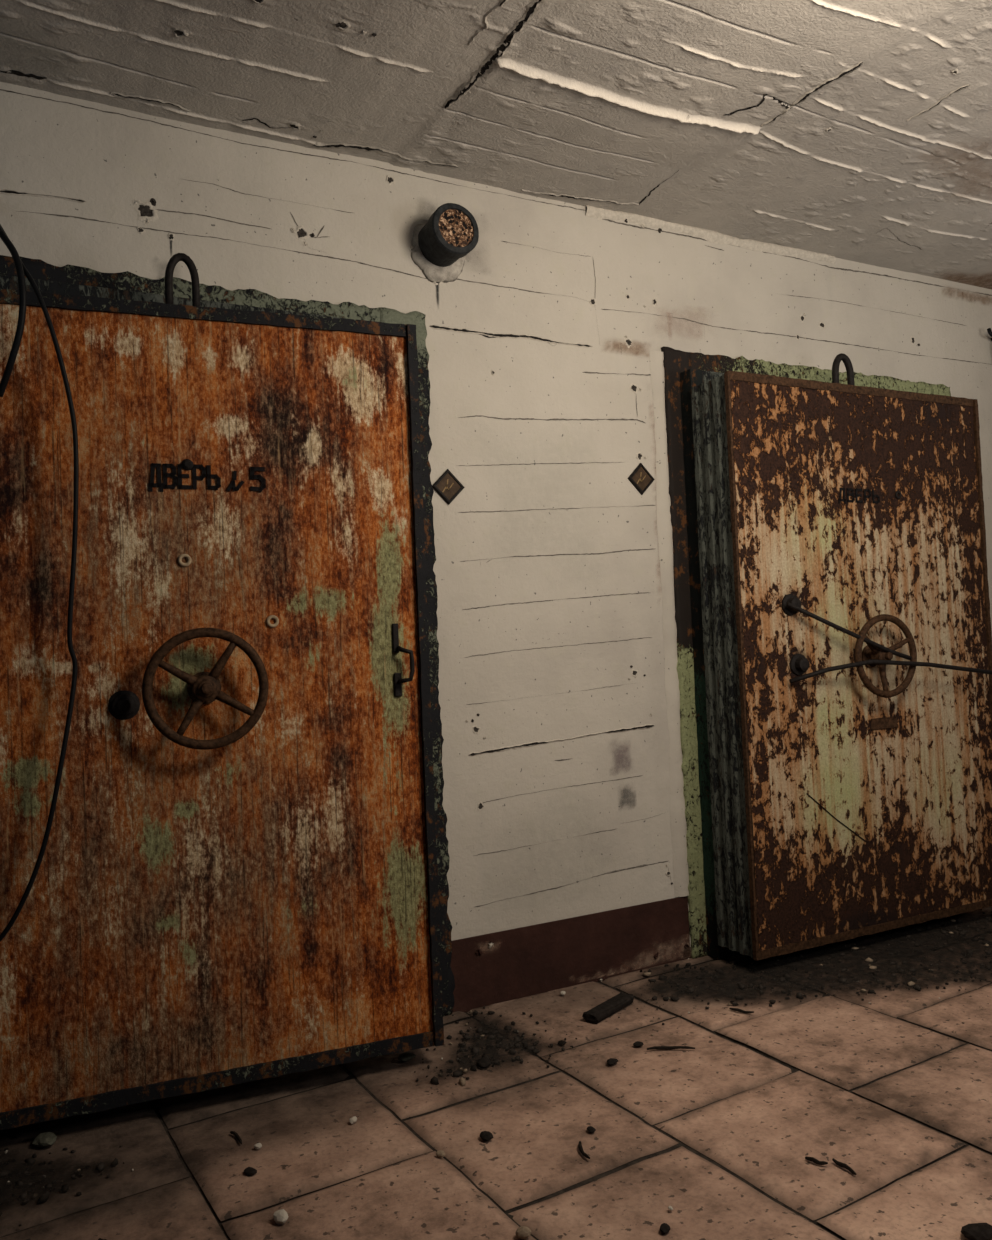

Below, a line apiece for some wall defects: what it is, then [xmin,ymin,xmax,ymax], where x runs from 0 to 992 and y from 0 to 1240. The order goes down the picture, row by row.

crack [443,0,546,109]
crack [725,62,863,127]
crack [907,84,970,121]
crack [0,70,734,251]
crack [459,460,620,468]
crack [458,505,656,513]
crack [460,548,653,565]
crack [463,592,649,610]
crack [464,637,651,658]
crack [469,724,654,803]